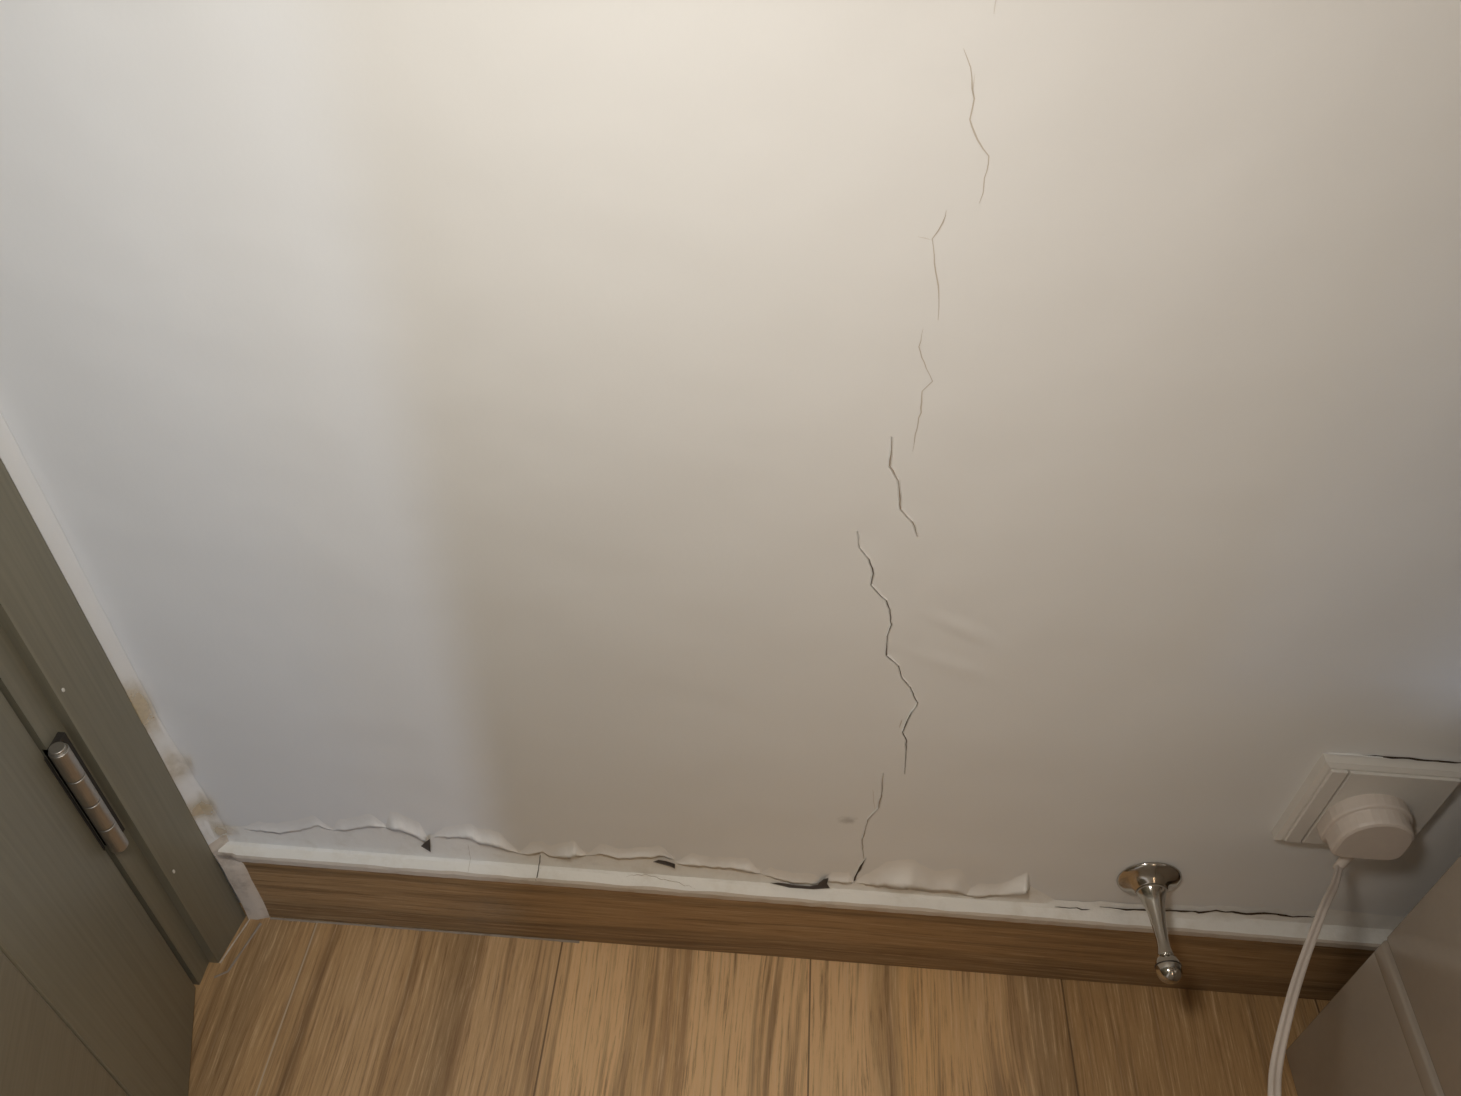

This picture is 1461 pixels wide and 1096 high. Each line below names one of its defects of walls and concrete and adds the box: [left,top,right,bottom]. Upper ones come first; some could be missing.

crack [964,50,989,203]
crack [888,213,946,537]
peeling [243,811,853,889]
crack [853,531,919,883]